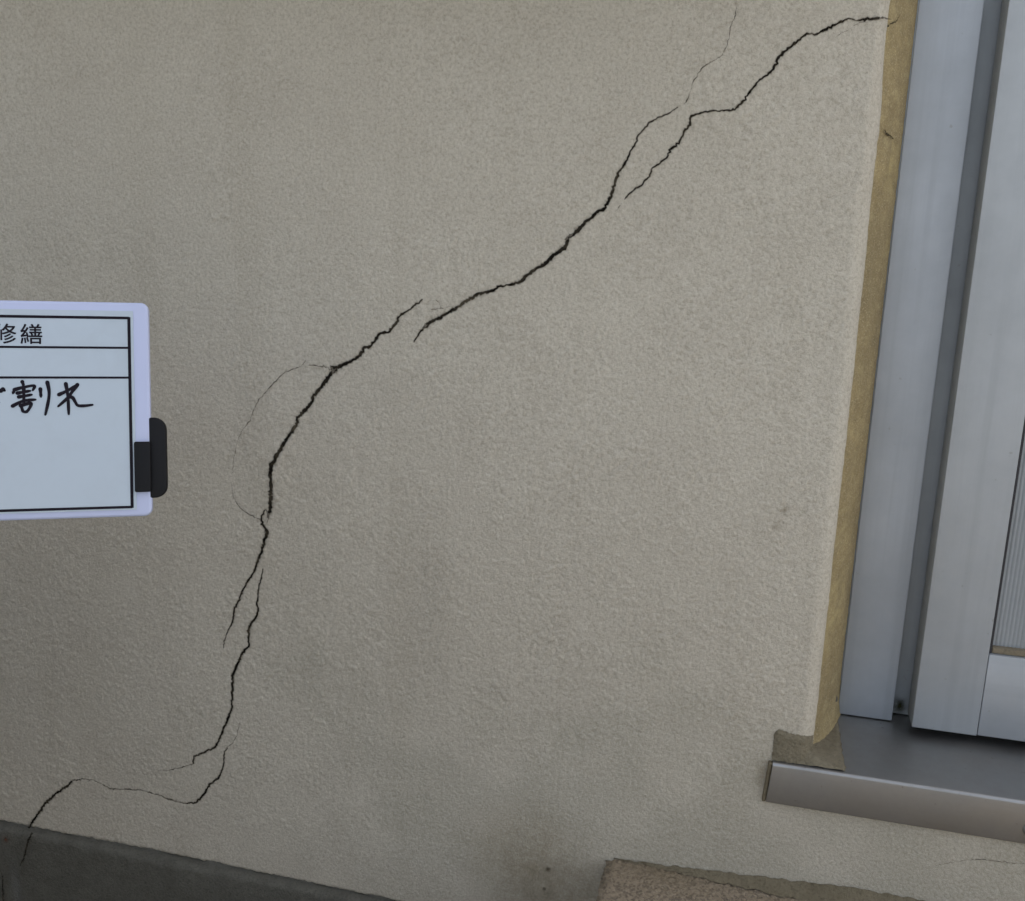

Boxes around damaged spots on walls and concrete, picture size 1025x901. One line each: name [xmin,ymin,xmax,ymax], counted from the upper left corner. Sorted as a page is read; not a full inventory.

crack [414,12,900,342]
crack [21,299,423,863]